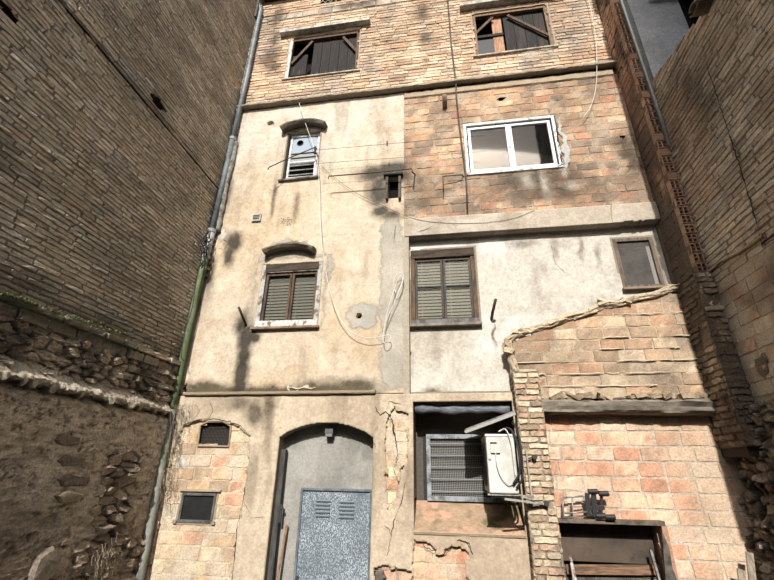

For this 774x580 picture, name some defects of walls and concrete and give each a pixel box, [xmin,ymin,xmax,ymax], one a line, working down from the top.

leakage [225,233,240,264]
leakage [183,315,373,422]
crack [372,401,407,555]
spalling [374,538,469,580]
crack [423,539,473,555]